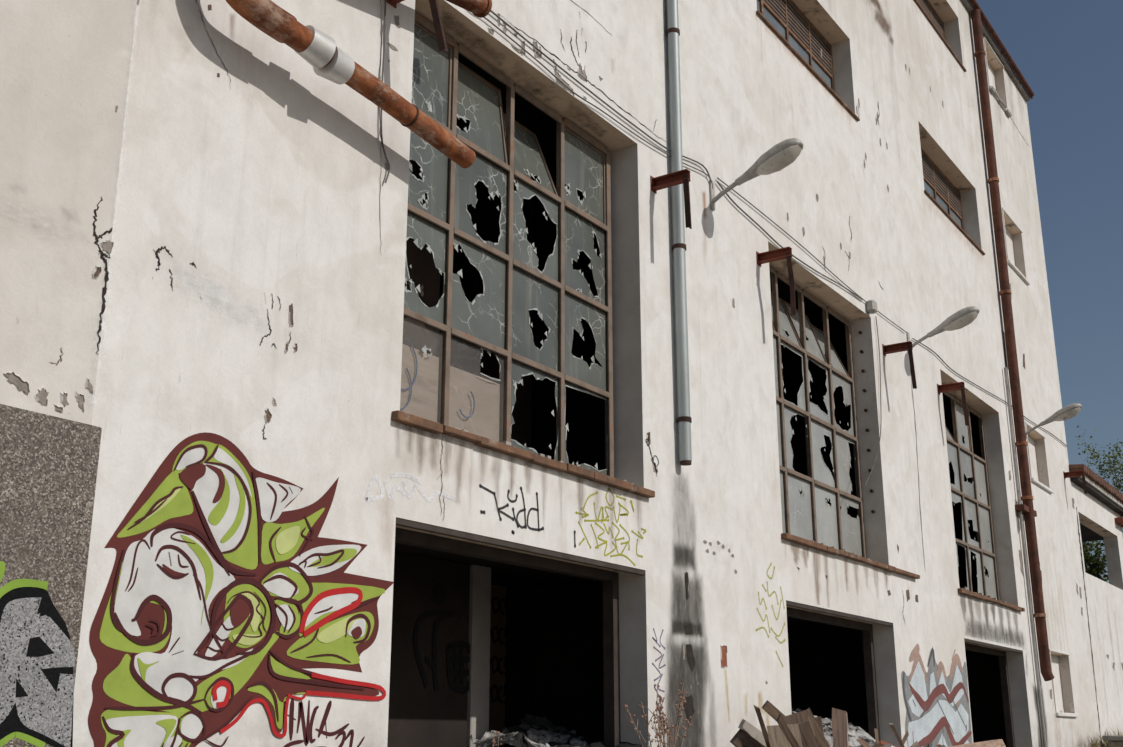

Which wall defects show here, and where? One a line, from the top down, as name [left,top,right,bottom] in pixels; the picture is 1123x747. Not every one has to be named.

crack [93,197,113,354]
peeling [4,370,93,413]
leakage [675,549,694,566]
leakage [793,544,819,603]
leakage [961,596,1017,633]
leakage [668,578,705,747]